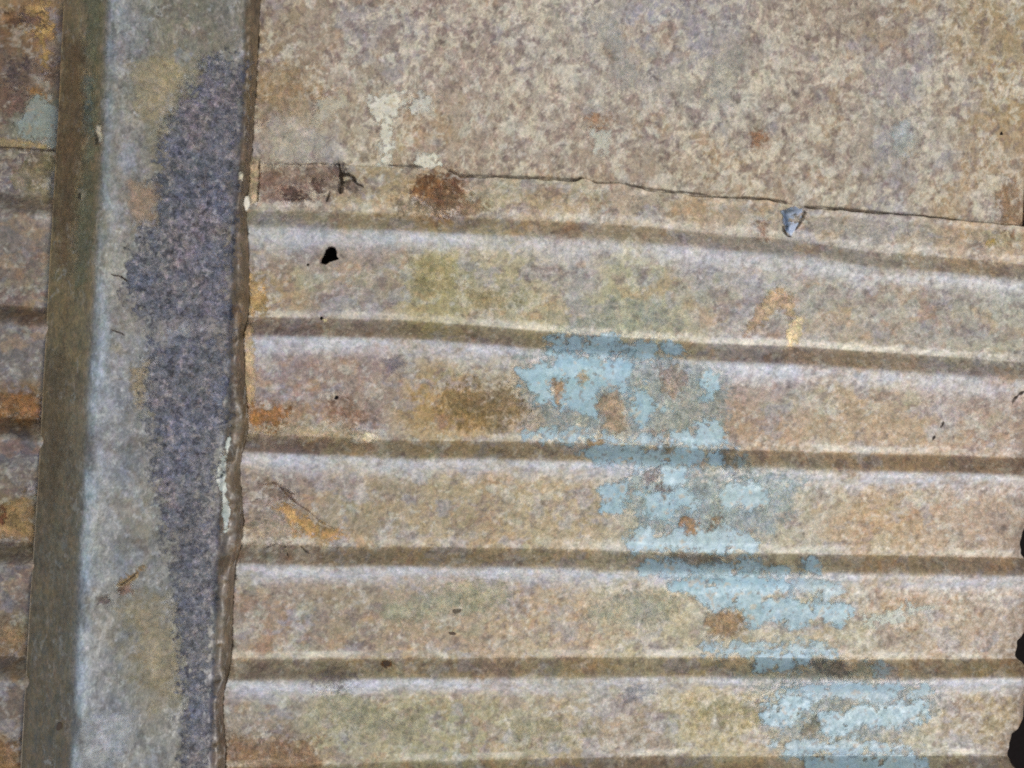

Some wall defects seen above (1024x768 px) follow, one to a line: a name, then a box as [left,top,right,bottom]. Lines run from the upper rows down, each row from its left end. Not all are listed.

crack [257,160,364,203]
corrosion [397,169,484,216]
crack [448,170,582,181]
crack [625,183,706,196]
crack [743,197,957,220]
corrosion [445,381,525,434]
peeling [514,332,936,768]